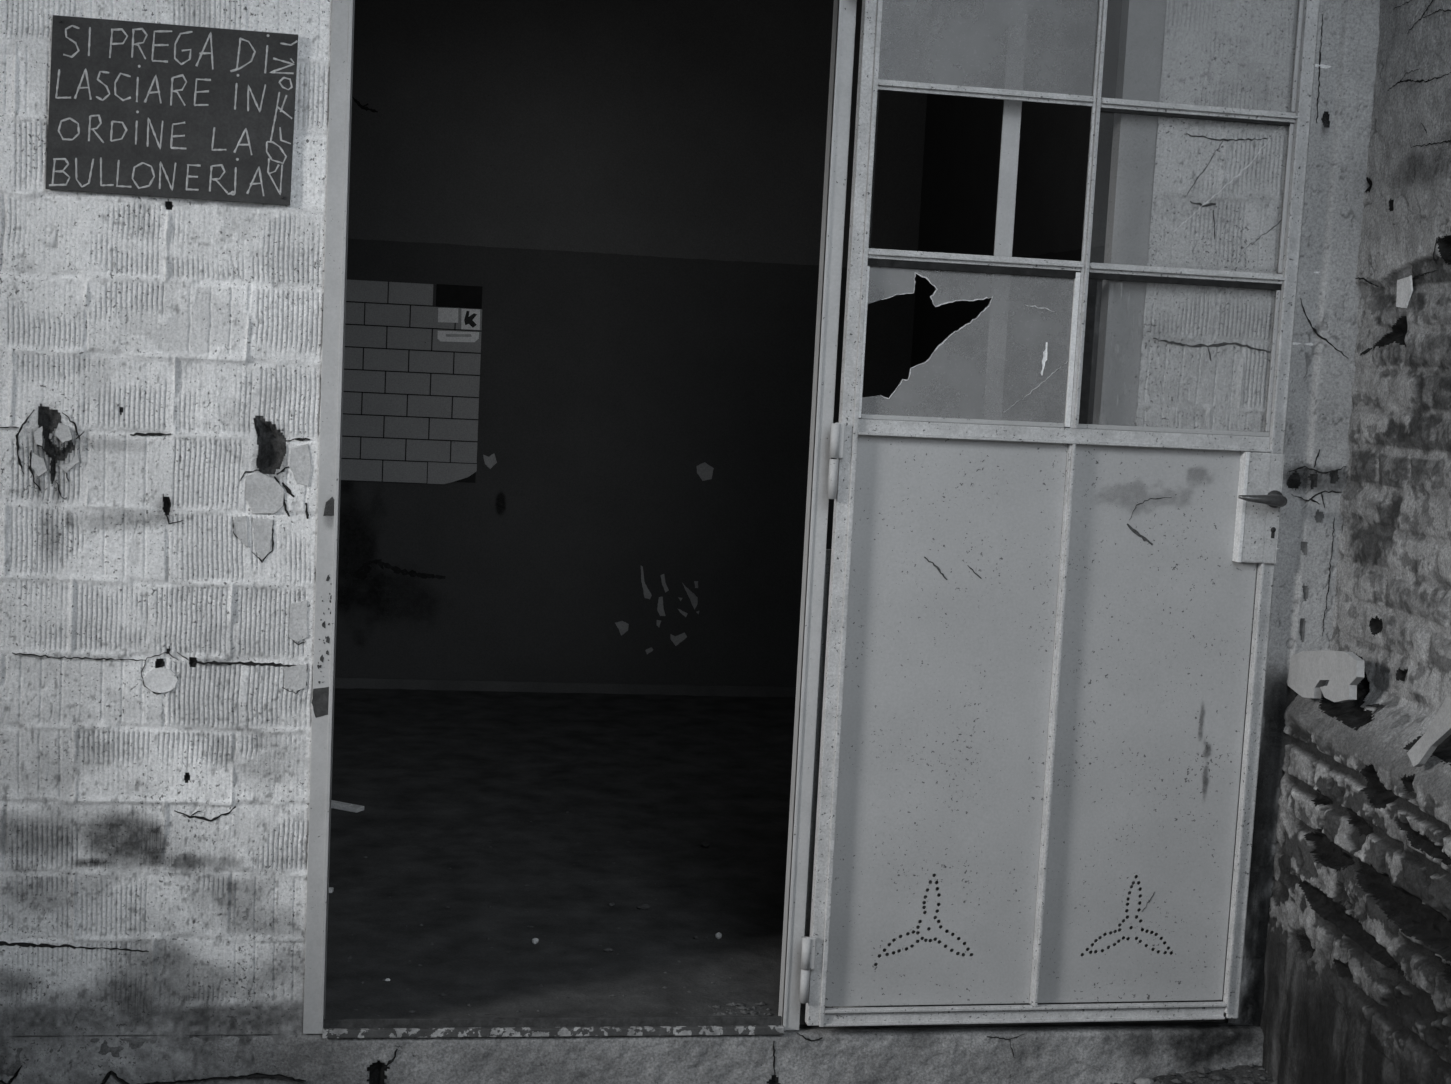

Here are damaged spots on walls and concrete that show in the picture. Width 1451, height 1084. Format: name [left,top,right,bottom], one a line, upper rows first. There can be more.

crack [1394,0,1451,34]
crack [1387,69,1451,91]
crack [1408,123,1451,148]
spalling [1360,275,1413,356]
hole [0,404,84,500]
spalling [232,415,311,563]
spalling [1287,449,1346,642]
spalling [1319,653,1384,731]
spalling [1311,764,1451,865]
spalling [1296,828,1451,983]
crack [0,941,149,952]
hole [367,1049,398,1084]